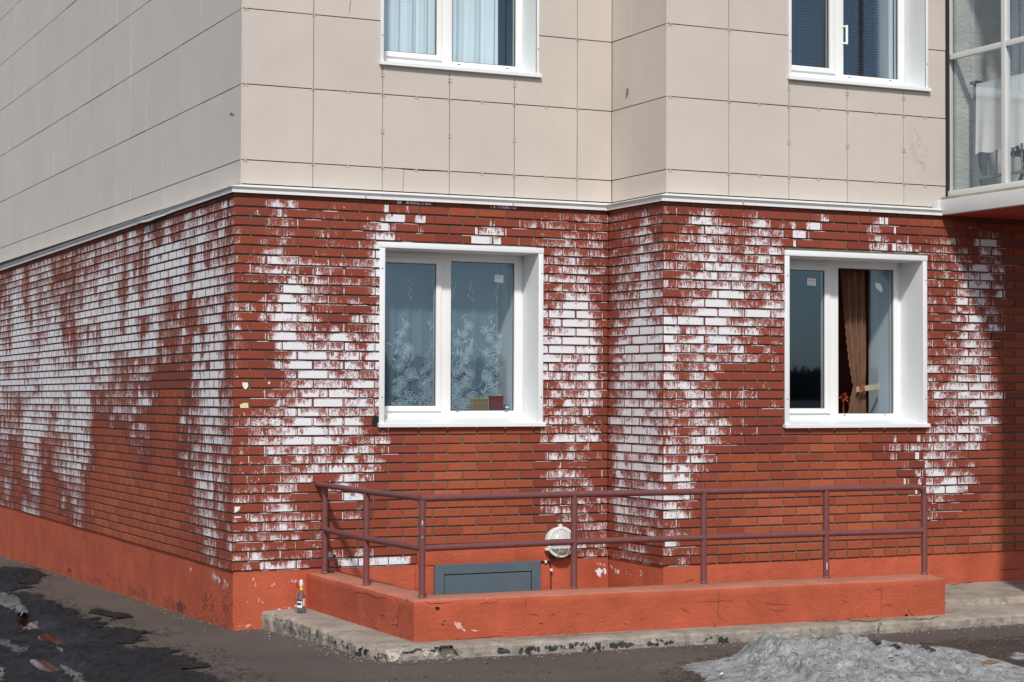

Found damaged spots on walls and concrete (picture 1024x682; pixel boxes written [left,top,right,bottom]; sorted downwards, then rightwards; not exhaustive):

damp [0,198,1024,586]